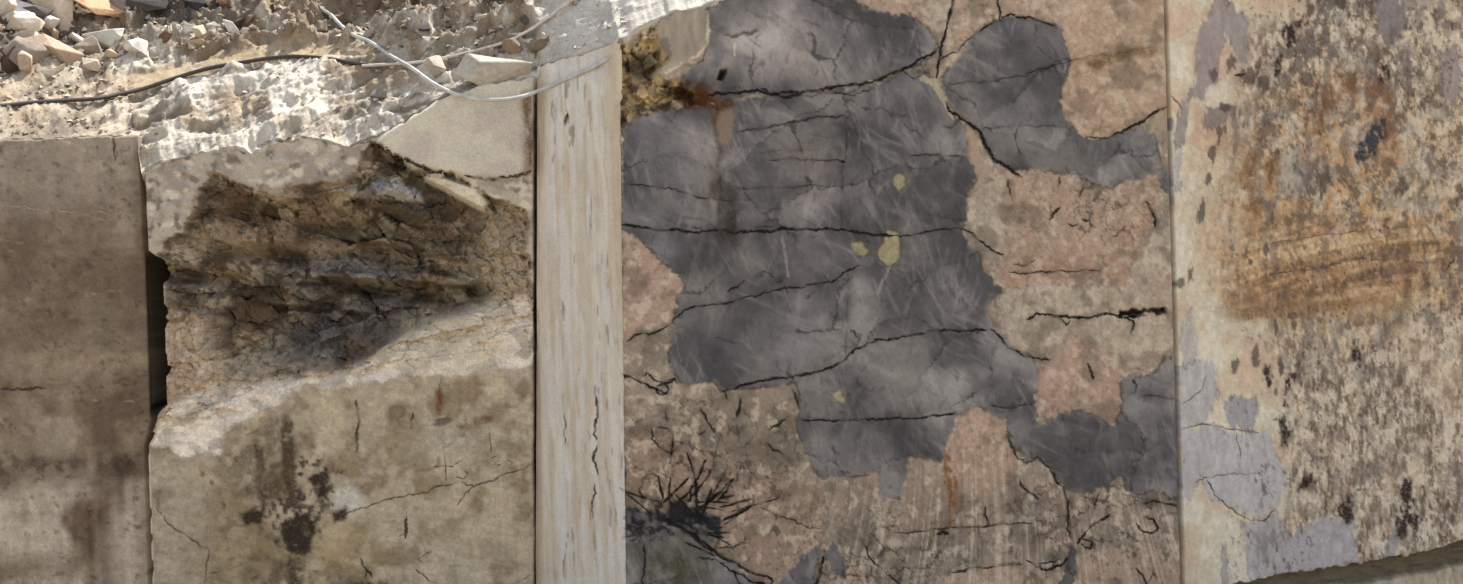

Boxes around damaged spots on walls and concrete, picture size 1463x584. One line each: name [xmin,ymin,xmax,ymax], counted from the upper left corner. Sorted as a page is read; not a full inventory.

spalling [619,21,728,129]
crack [707,0,1054,191]
crack [1089,99,1182,139]
spalling [149,139,537,459]
crack [346,176,1164,584]
leakage [243,422,346,584]
crack [865,380,1274,584]